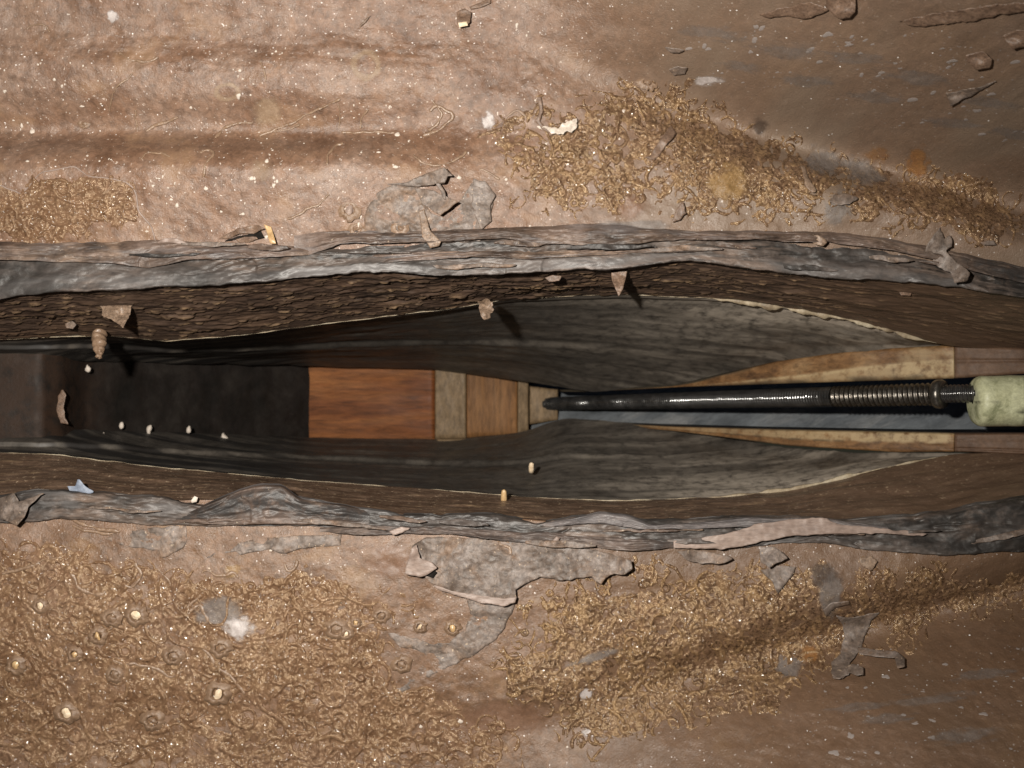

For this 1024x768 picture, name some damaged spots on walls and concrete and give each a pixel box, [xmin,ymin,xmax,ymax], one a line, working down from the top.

peeling [364,167,496,248]
peeling [388,536,632,694]
peeling [823,601,905,679]